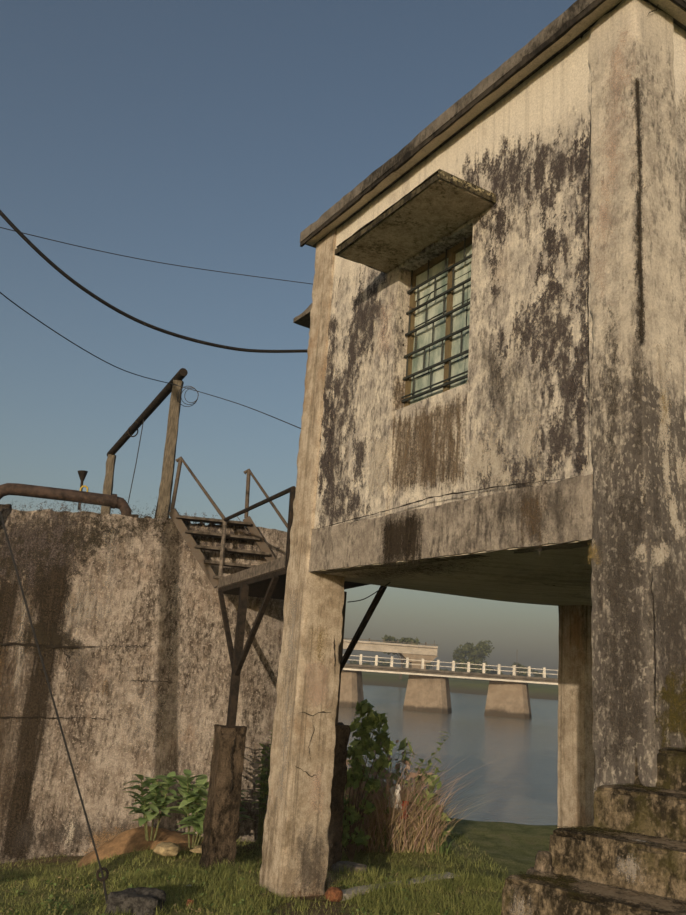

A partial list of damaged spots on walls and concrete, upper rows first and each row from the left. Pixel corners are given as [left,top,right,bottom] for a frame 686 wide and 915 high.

leakage [489,203,506,298]
leakage [537,210,556,302]
leakage [572,132,591,472]
leakage [631,78,647,451]
leakage [317,316,338,493]
leakage [352,434,367,488]
leakage [392,394,467,493]
leakage [492,329,508,408]
leakage [469,434,576,532]
leakage [336,505,484,581]
leakage [0,502,127,860]
crack [295,711,331,780]